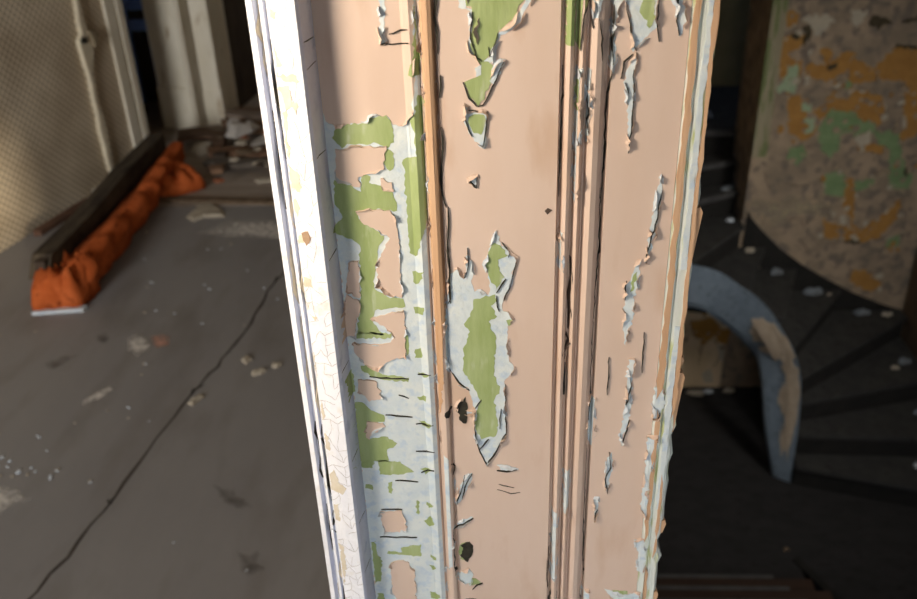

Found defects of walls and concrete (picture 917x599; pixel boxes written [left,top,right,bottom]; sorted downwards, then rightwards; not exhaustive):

peeling [273,45,302,217]
peeling [458,0,533,149]
peeling [558,64,594,204]
peeling [564,0,660,307]
peeling [776,9,917,162]
peeling [323,0,518,599]
peeling [555,227,565,273]
peeling [604,0,733,599]
peeling [585,322,597,480]
peeling [749,317,800,461]
peeling [548,468,572,599]
peeling [582,453,615,571]